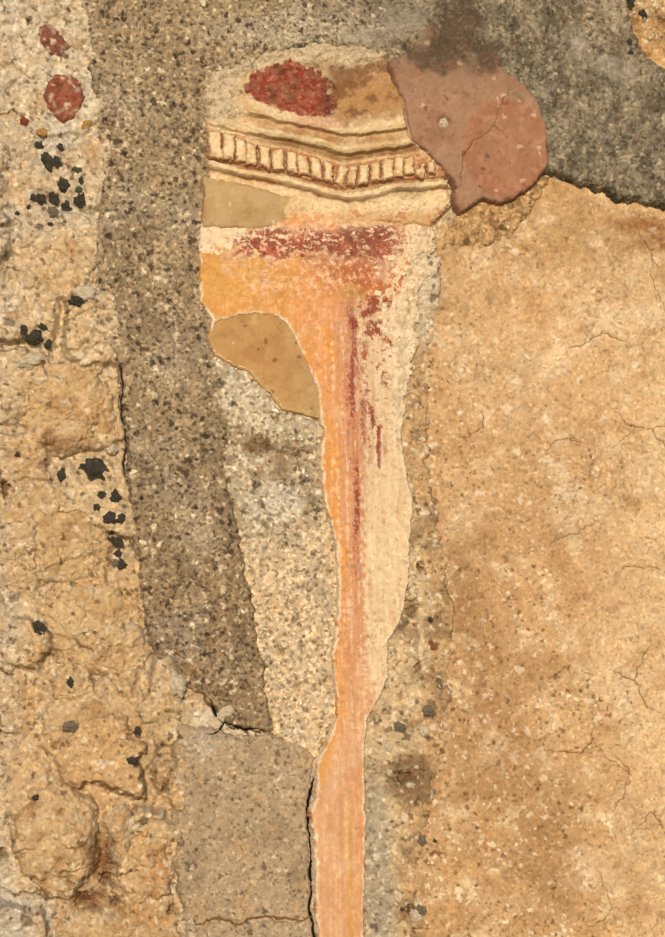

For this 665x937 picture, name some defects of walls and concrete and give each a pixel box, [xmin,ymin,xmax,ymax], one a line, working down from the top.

crack [460,93,508,186]
spalling [200,176,314,255]
crack [637,229,665,311]
peeling [374,255,415,373]
crack [616,412,665,446]
spalling [207,313,337,770]
crack [609,643,661,713]
crack [549,729,633,812]
crack [182,757,317,937]